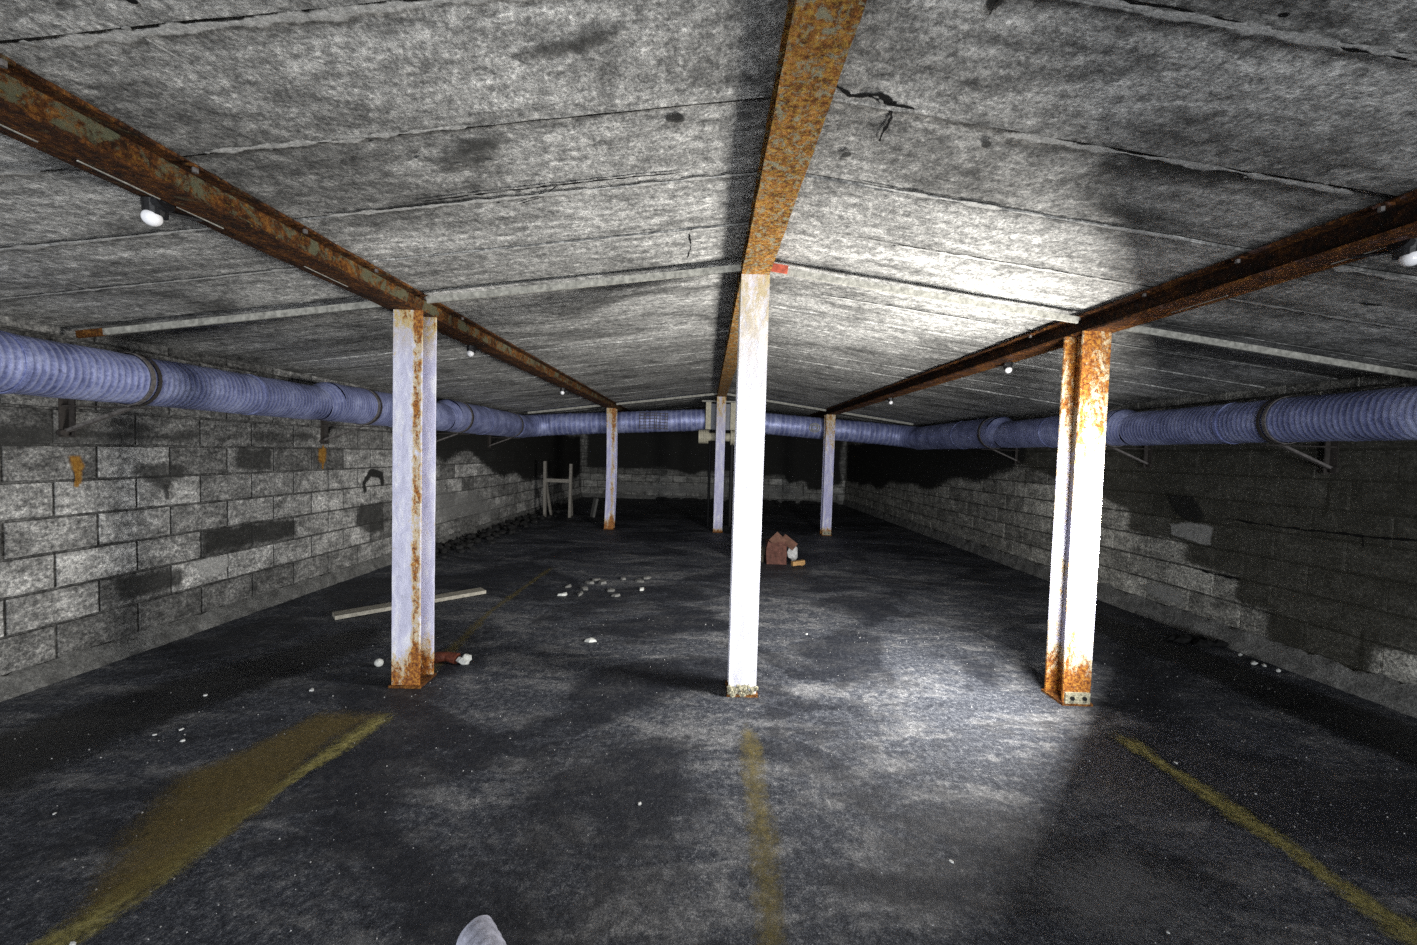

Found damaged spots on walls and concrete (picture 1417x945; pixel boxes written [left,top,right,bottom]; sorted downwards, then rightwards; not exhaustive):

rust [70,456,84,487]